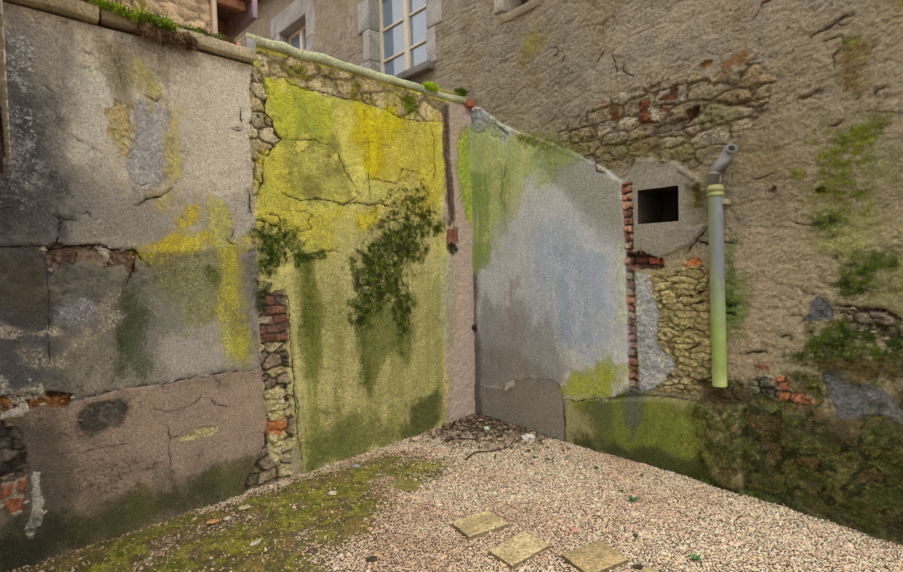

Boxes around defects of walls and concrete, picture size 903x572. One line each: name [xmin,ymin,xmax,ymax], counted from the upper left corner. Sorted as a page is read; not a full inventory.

crack [812,14,854,69]
crack [249,62,454,232]
damp [441,105,455,222]
flaking render [558,56,777,170]
crack [831,87,903,127]
crack [1,210,146,366]
flaking render [39,243,136,274]
flaking render [245,290,297,491]
flaking render [621,182,713,395]
flaking render [748,363,822,409]
flaking render [837,306,903,362]
flaking render [0,389,75,539]